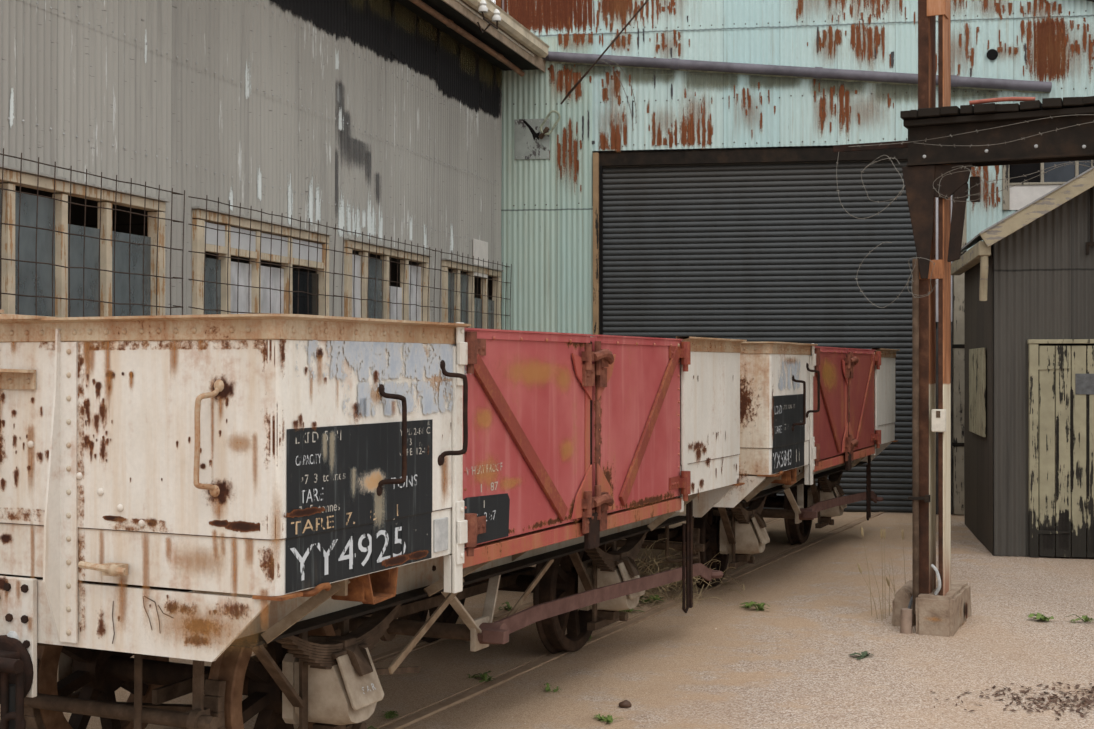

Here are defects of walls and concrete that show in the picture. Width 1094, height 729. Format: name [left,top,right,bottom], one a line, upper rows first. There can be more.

corrosion [492,0,690,58]
corrosion [807,0,915,67]
corrosion [952,0,1094,82]
corrosion [548,64,632,152]
corrosion [647,88,713,149]
corrosion [729,82,776,136]
corrosion [549,118,582,192]
corrosion [971,165,1000,210]
peeling [1056,387,1074,550]